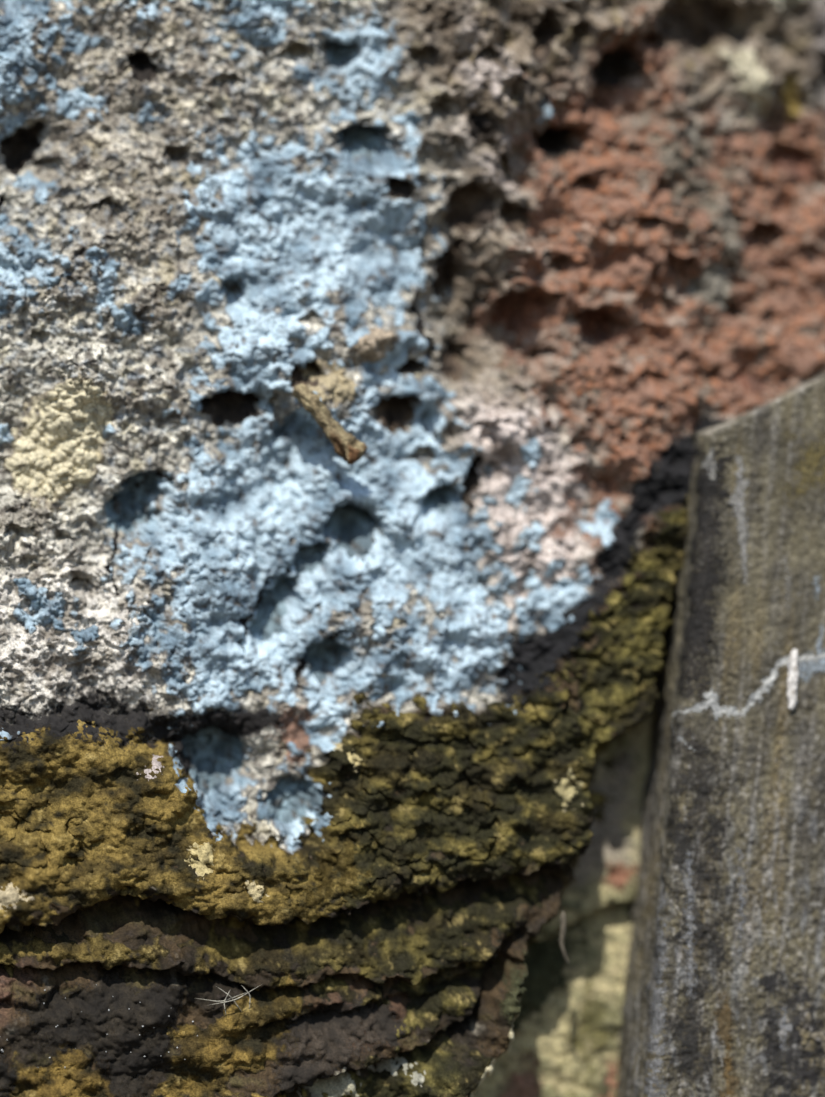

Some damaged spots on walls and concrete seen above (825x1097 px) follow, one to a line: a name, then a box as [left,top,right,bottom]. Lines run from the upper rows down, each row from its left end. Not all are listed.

crack [409,234,436,360]
rust [466,6,825,546]
spalling [0,0,825,850]
crack [238,561,294,653]
damp [0,670,283,781]
damp [333,743,366,772]
damp [553,768,584,812]
damp [0,882,35,916]
damp [184,842,215,881]
damp [643,727,747,1097]
damp [14,965,194,1097]
damp [269,993,426,1097]